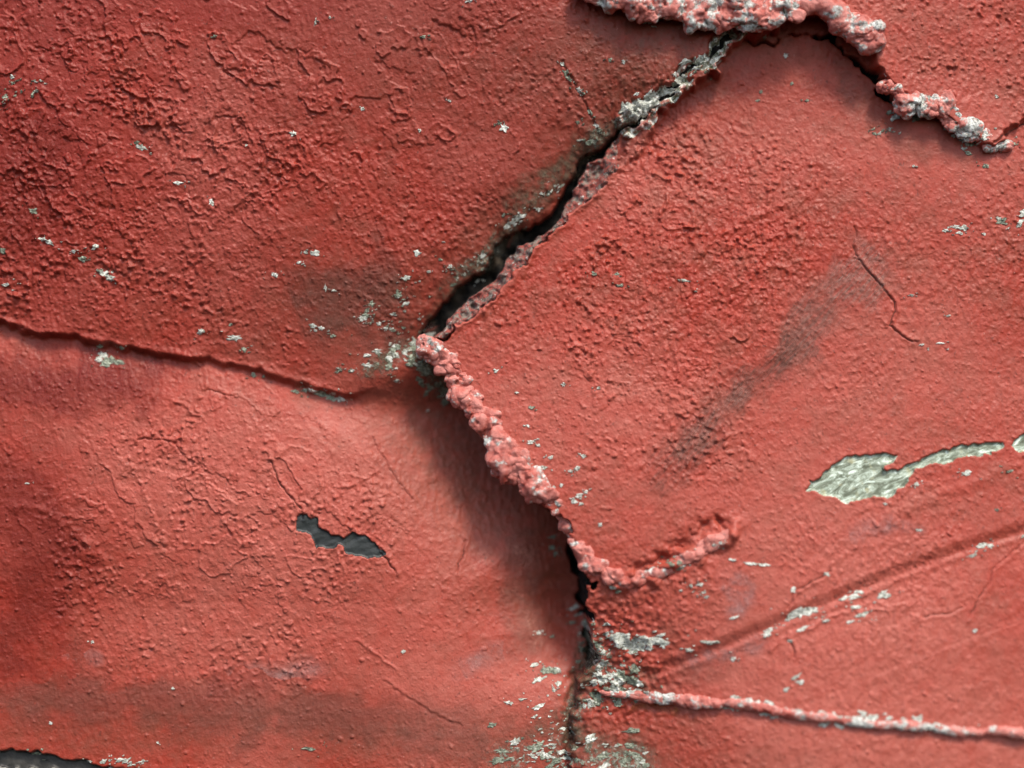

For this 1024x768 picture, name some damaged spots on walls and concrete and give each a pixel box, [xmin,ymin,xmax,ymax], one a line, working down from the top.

crack [421,29,891,341]
crack [852,228,912,342]
peeling [806,434,1024,505]
peeling [296,514,386,559]
crack [567,530,608,675]
peeling [83,755,145,768]